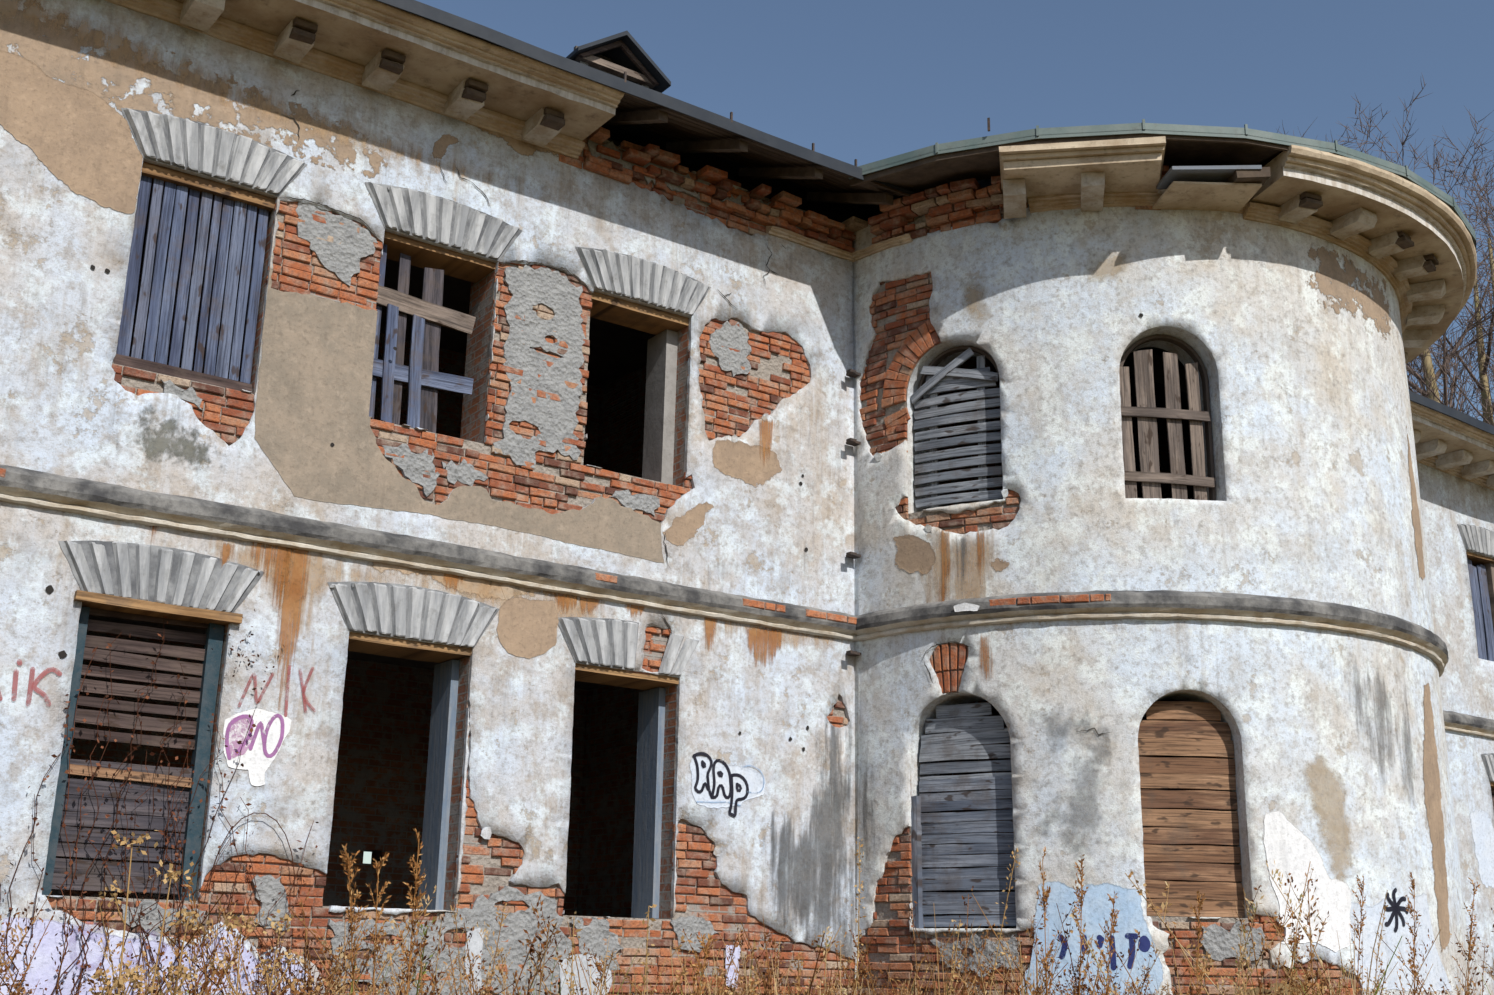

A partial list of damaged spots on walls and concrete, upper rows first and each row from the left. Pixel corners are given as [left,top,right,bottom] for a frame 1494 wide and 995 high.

flaking render [112,198,714,563]
flaking render [687,319,810,487]
flaking render [859,272,942,462]
peeling [1307,246,1391,340]
flaking render [893,489,1021,574]
flaking render [929,643,968,694]
flaking render [46,780,1035,995]
water stain [771,725,867,932]